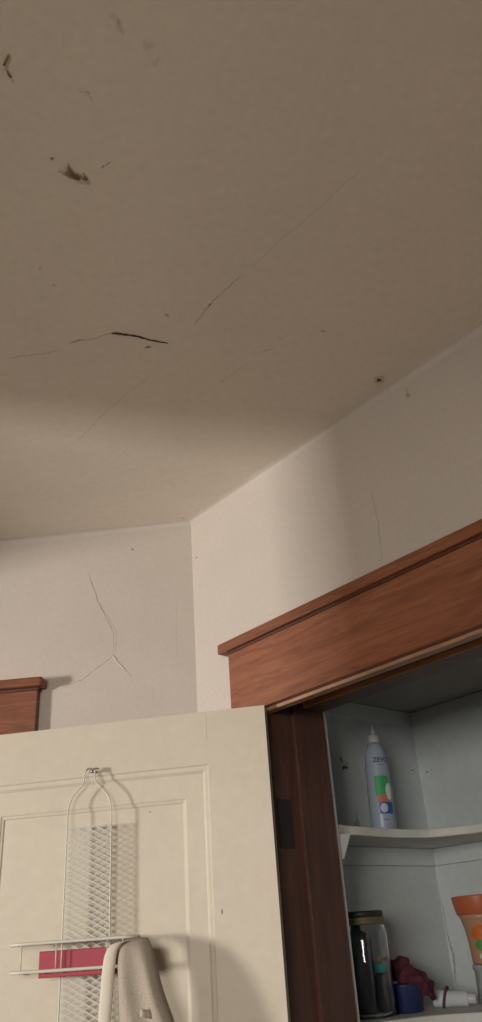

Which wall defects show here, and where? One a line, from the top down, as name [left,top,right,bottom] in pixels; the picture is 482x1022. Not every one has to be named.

crack [111,332,168,344]